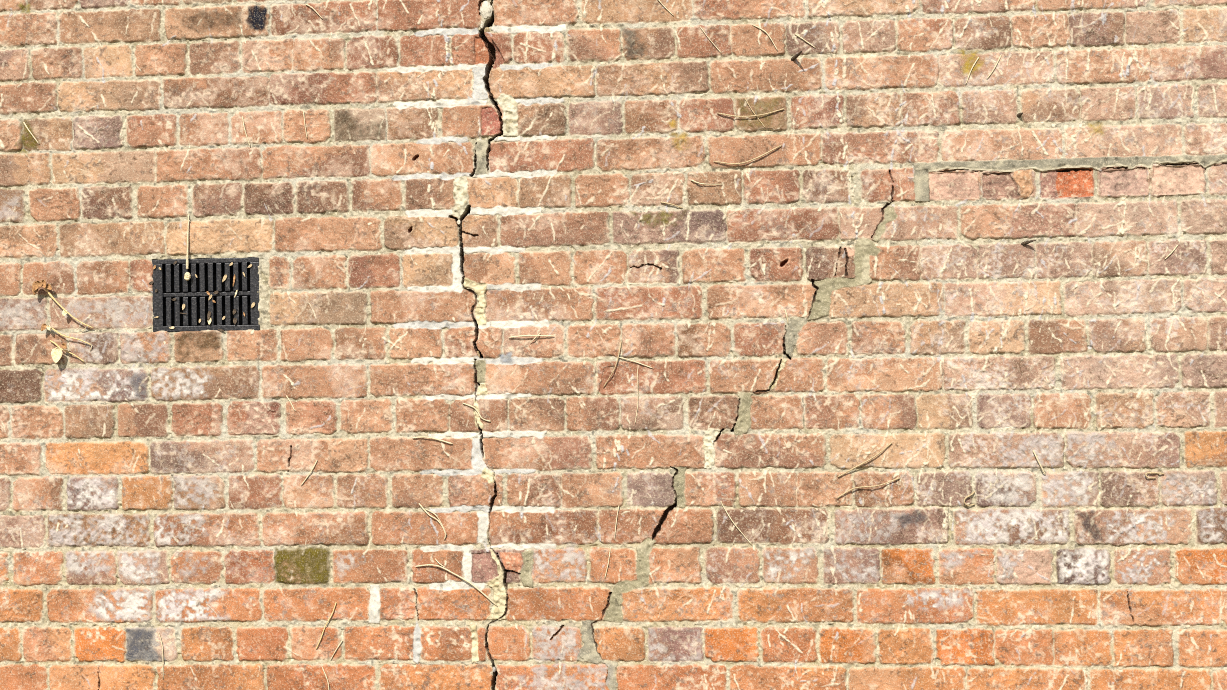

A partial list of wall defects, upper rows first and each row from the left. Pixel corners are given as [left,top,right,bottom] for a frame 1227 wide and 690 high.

crack [931,168,1012,176]
crack [1056,162,1227,172]
crack [630,262,662,270]
crack [713,169,895,443]
crack [448,0,521,690]
crack [652,466,679,541]
crack [550,592,612,683]
crack [1126,591,1134,623]